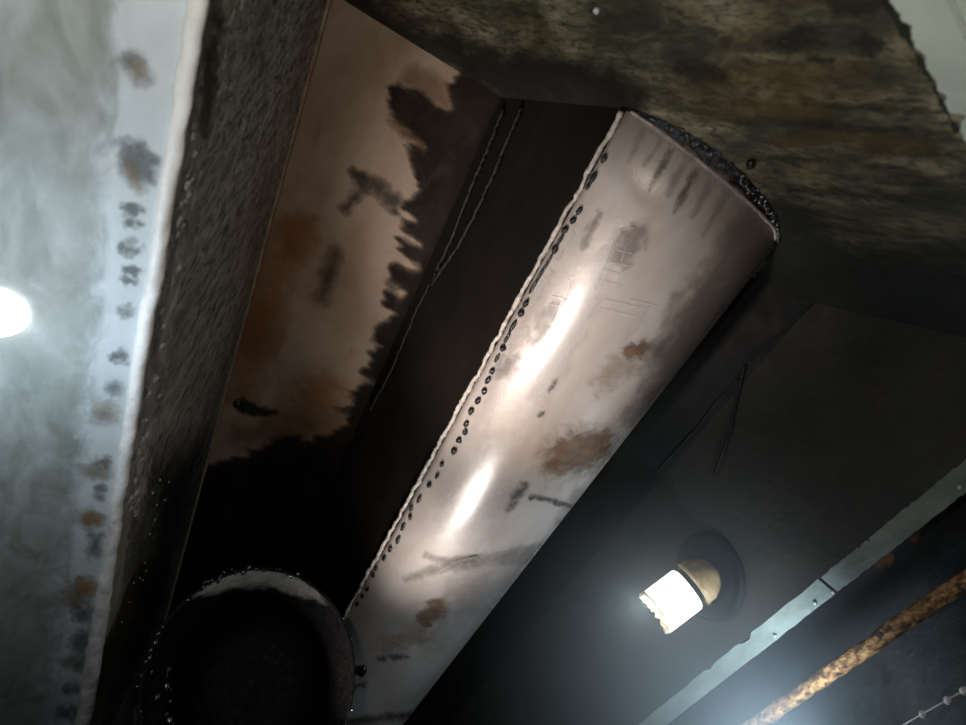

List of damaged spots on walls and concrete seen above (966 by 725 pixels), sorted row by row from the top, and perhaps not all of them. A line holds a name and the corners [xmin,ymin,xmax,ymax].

water stain [124,144,158,187]
water stain [342,169,401,213]
water stain [122,203,143,226]
water stain [122,267,138,285]
corrosion [604,342,648,377]
corrosion [546,433,612,472]